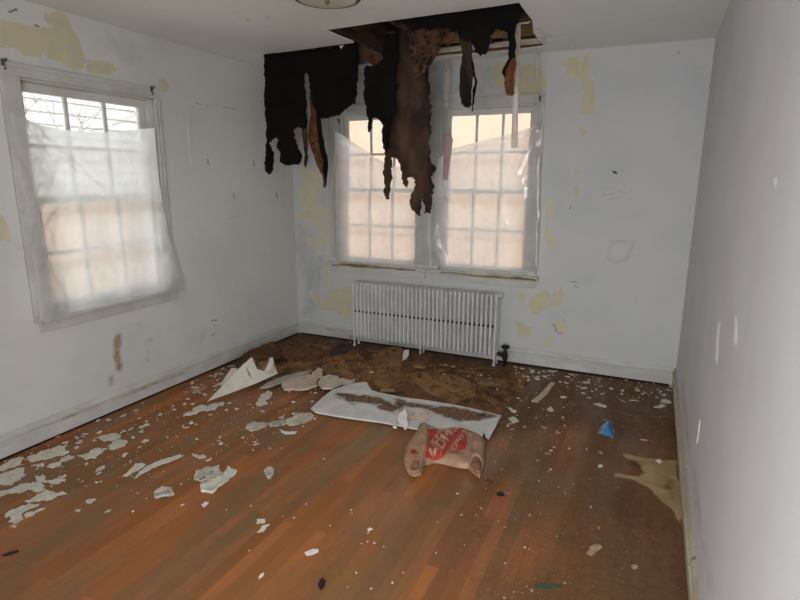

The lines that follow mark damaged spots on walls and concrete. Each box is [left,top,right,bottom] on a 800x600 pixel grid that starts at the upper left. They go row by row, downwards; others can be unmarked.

peeling [0,10,117,75]
peeling [490,62,507,95]
peeling [561,51,595,115]
peeling [294,165,353,320]
water stain [614,454,683,528]